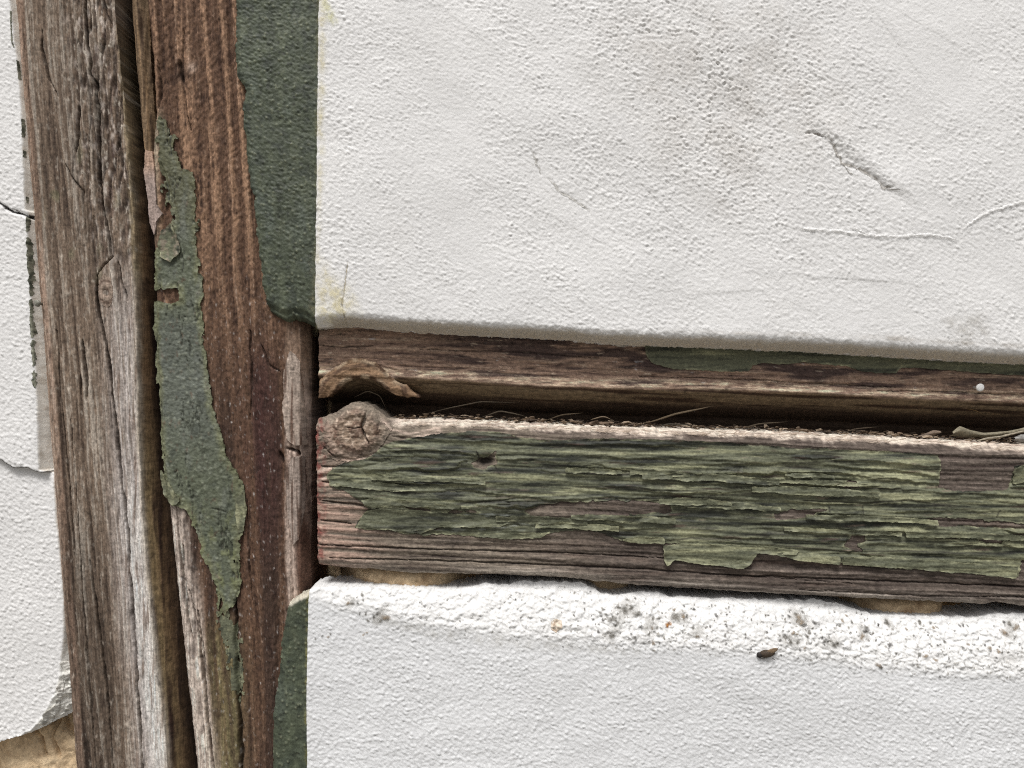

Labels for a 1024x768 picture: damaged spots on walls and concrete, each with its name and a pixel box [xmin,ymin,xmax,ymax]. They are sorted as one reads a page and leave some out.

crack [814,133,903,190]
crack [0,203,35,220]
crack [797,201,1024,240]
peeling [153,116,247,703]
peeling [327,430,1024,579]
spalling [39,662,72,727]